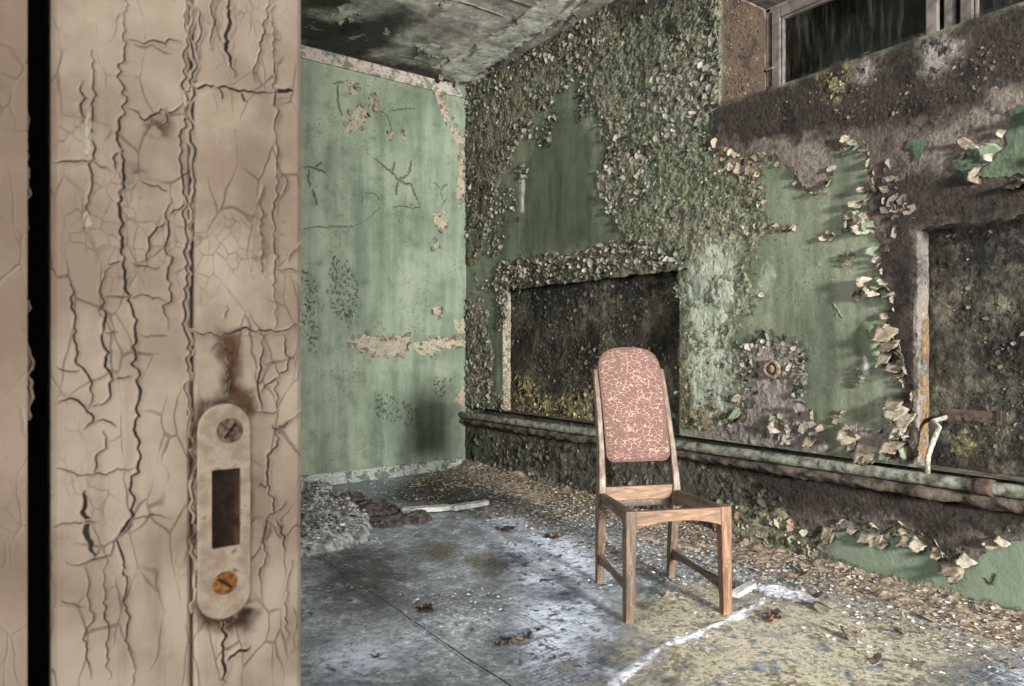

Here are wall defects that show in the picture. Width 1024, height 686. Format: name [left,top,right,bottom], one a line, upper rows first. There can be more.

leakage [301,0,450,82]
mould [606,0,1024,154]
corrosion [191,337,254,443]
crack [27,0,447,686]
peeling [302,0,1024,611]
leakage [471,170,1024,486]
corrosion [919,319,930,462]
crack [360,585,514,686]